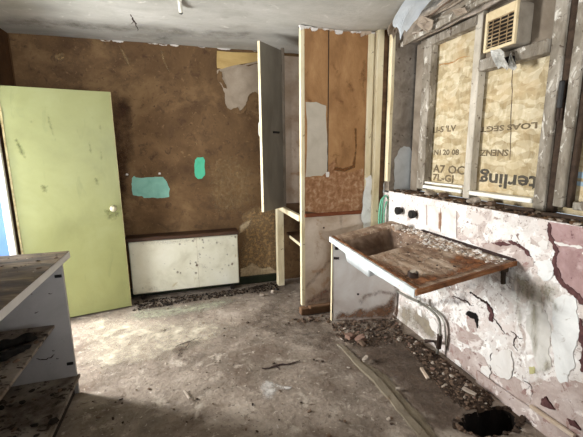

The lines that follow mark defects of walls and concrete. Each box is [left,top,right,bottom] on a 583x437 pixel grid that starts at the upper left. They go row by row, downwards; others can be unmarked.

flaking render [217,48,259,114]
peeling [394,146,412,190]
flaking render [441,222,583,437]